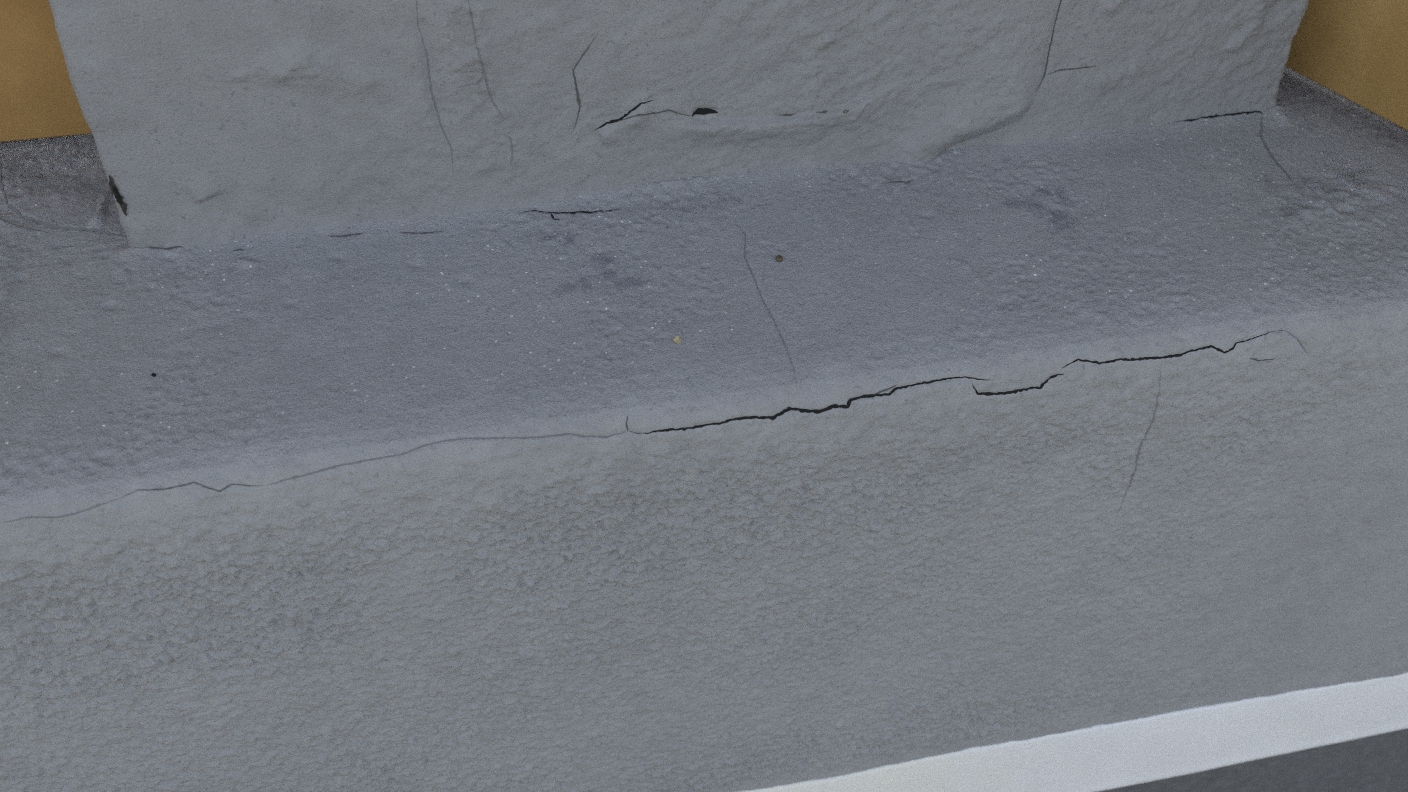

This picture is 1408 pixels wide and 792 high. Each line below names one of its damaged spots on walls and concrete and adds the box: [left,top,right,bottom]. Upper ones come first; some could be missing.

crack [571,38,691,134]
crack [1161,111,1295,184]
crack [3,214,1308,523]